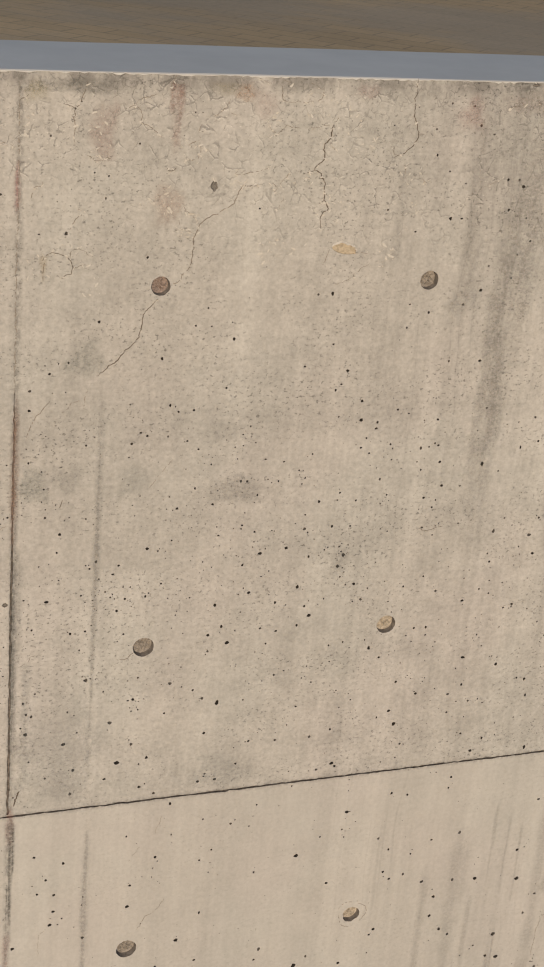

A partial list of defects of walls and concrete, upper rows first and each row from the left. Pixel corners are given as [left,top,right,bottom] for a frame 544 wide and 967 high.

crack [65,83,110,163]
crack [126,75,177,138]
crack [394,79,425,183]
crack [25,119,338,435]